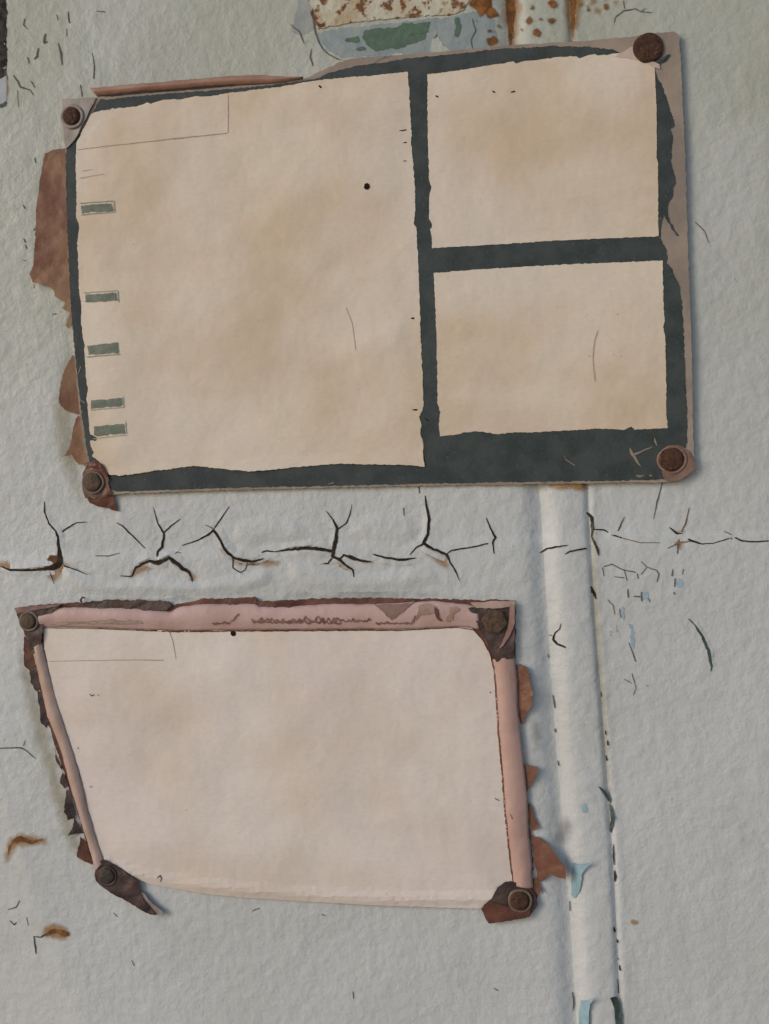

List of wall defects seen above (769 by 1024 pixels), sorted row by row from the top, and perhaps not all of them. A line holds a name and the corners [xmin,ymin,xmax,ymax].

peeling [291,0,498,66]
rust [470,0,609,46]
crack [0,486,496,583]
crack [540,482,769,617]
peeling [610,589,650,662]
peeling [569,861,595,910]
peeling [610,957,621,1024]